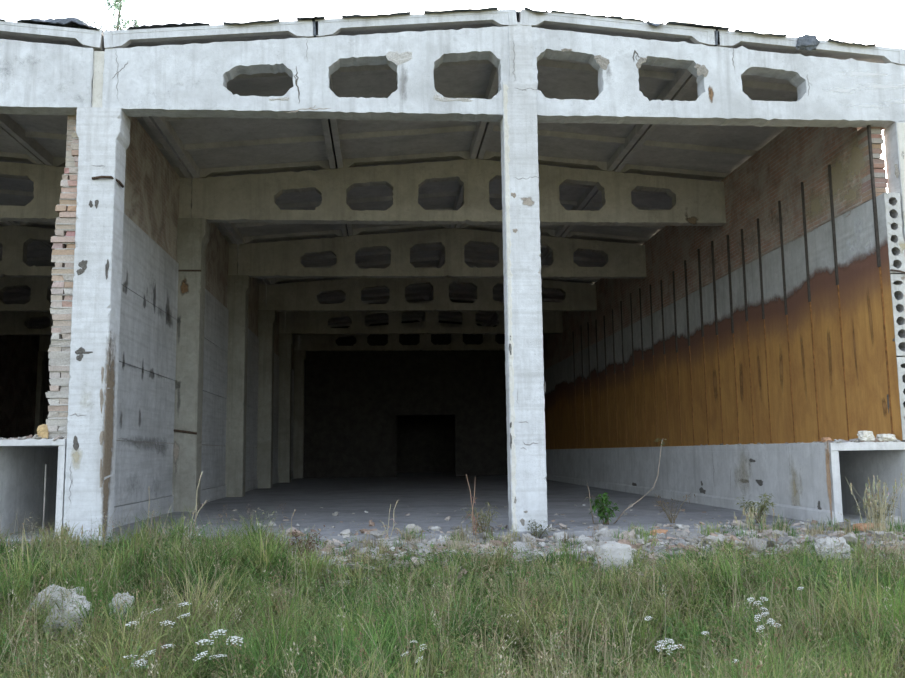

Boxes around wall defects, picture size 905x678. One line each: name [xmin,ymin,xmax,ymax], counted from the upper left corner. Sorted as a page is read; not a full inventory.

crack [287,41,329,113]
spalling [386,51,412,65]
spalling [594,55,610,70]
spalling [694,63,709,77]
spalling [433,93,473,102]
spalling [76,260,88,275]
water stain [143,290,180,337]
spalling [75,347,93,361]
water stain [102,352,125,539]